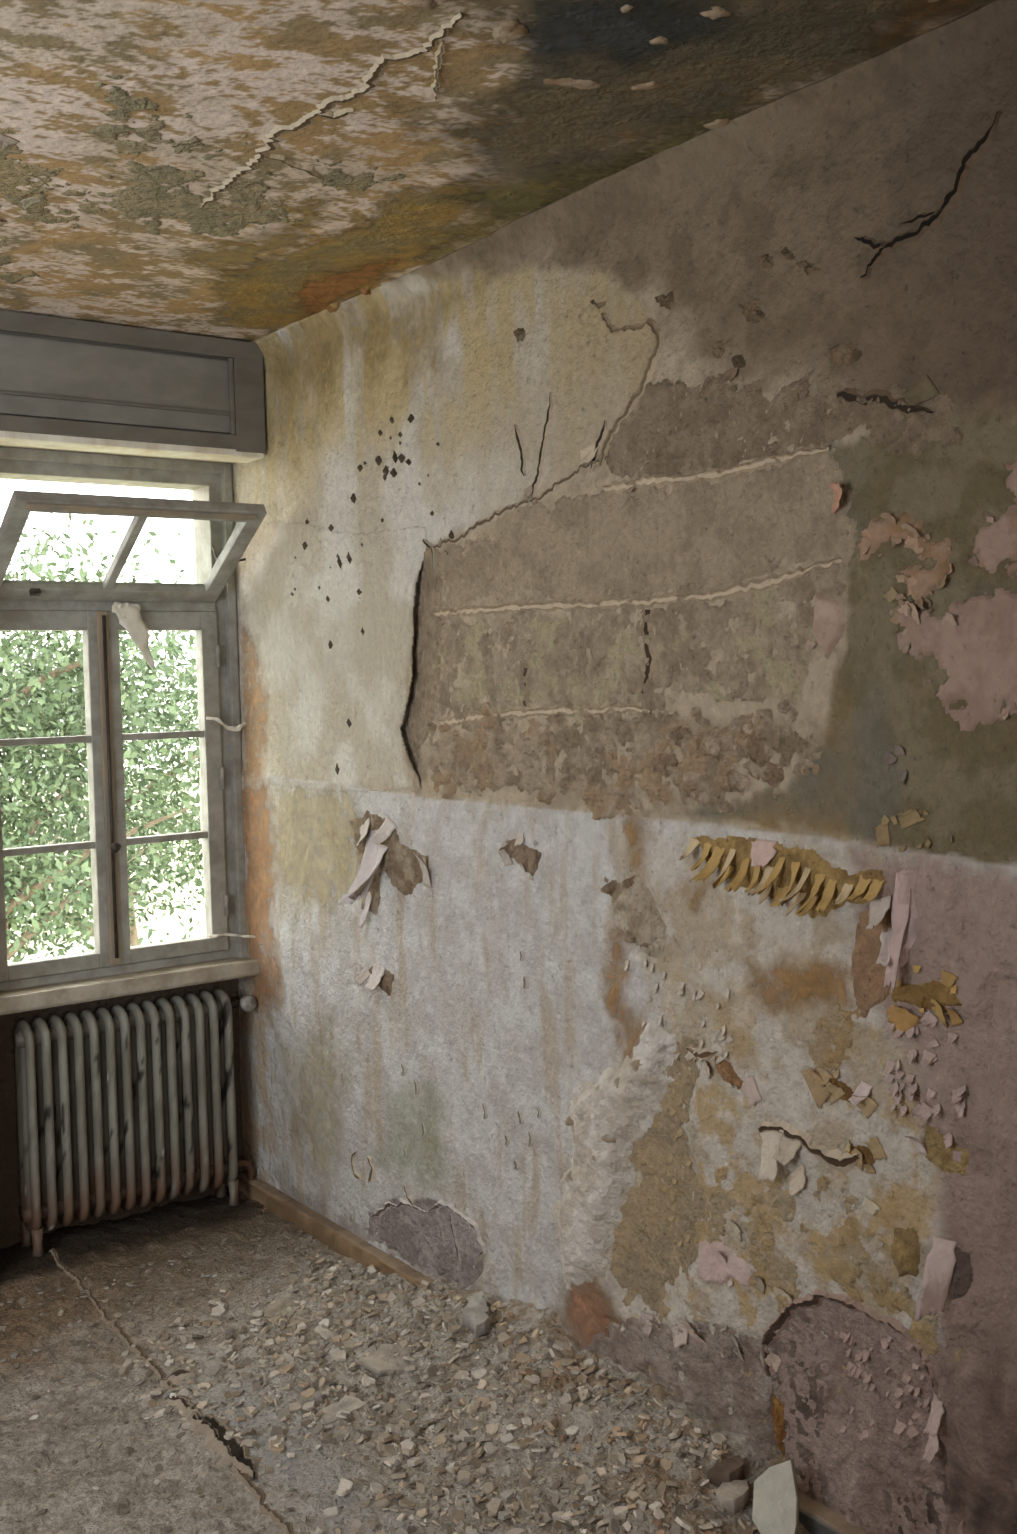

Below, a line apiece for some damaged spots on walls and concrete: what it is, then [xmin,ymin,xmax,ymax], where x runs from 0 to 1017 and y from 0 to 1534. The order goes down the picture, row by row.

peeling [0,75,303,292]
crack [200,12,467,209]
leakage [187,0,997,337]
crack [854,111,1002,280]
spalling [266,339,1017,820]
peeling [339,810,431,929]
spalling [497,833,542,880]
peeling [354,963,394,996]
peeling [679,835,969,1175]
spalling [367,1184,486,1289]
spalling [586,959,973,1534]
crack [48,1248,294,1534]